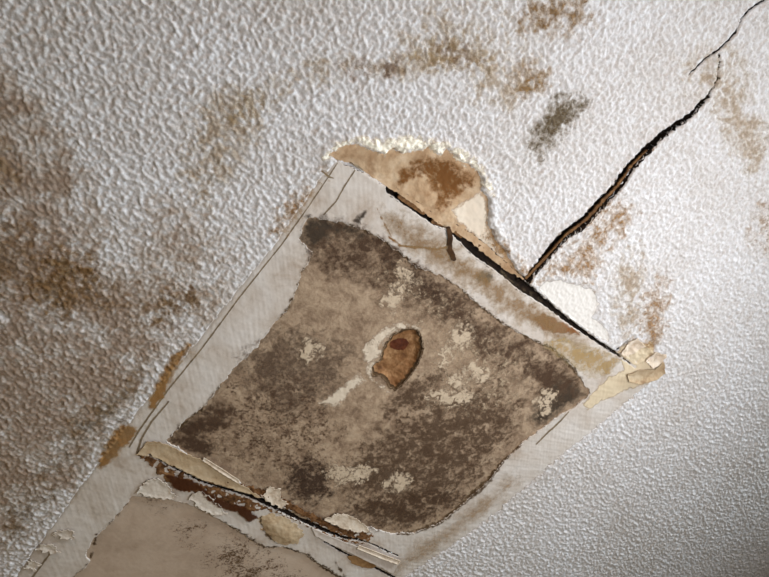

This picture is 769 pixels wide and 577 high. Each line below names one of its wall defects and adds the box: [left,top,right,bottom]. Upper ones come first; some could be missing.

peeling [322,135,524,280]
crack [385,0,764,364]
leakage [0,222,115,323]
leakage [156,285,197,324]
crack [129,162,363,454]
leakage [59,369,141,448]
leakage [170,211,618,530]
peeling [167,217,667,533]
peeling [73,478,340,577]
crack [159,459,398,577]
leakage [408,499,491,561]